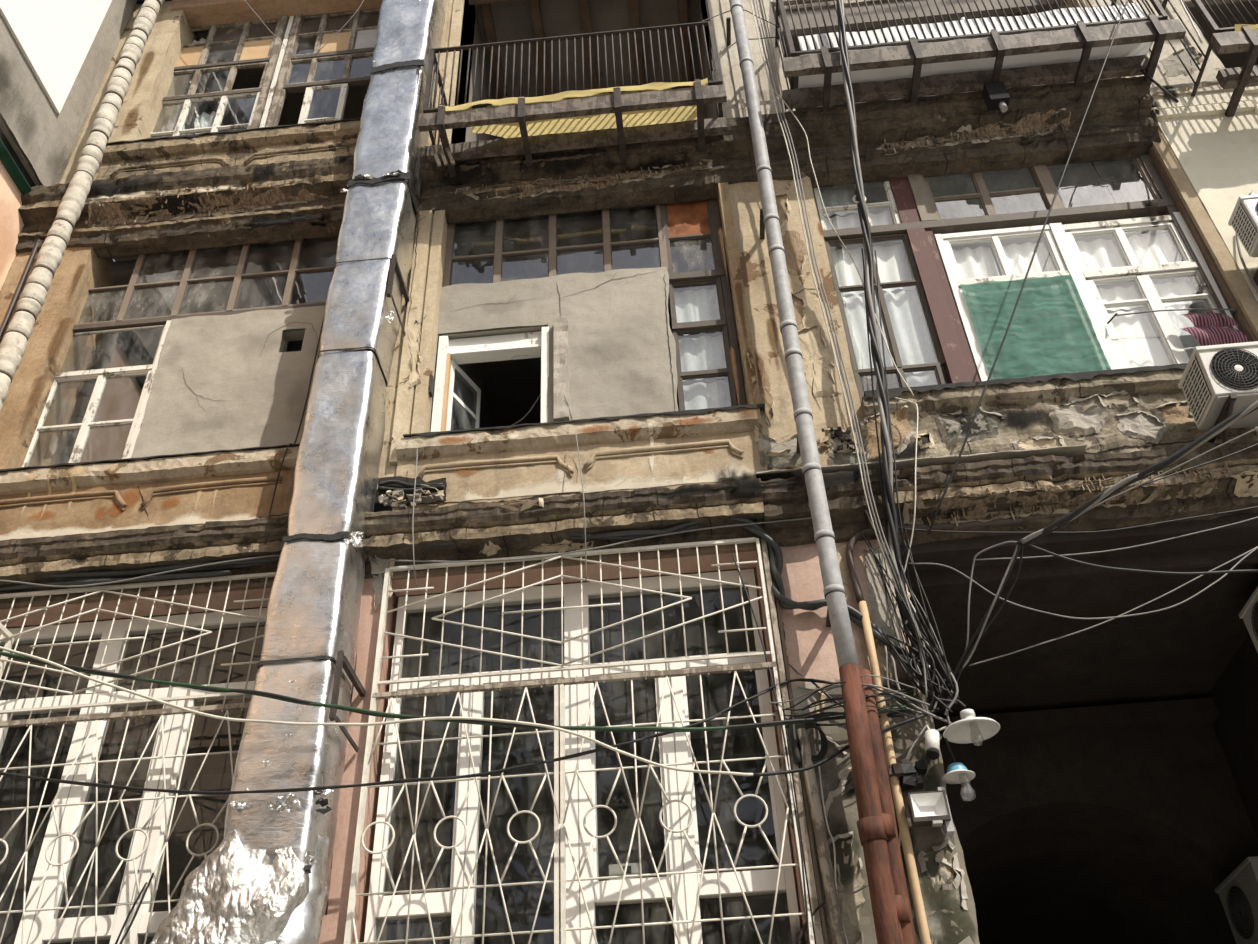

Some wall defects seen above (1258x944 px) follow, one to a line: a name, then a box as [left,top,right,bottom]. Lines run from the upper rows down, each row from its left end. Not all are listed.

spalling [876,107,1071,155]
spalling [85,180,329,228]
spalling [447,159,713,200]
spalling [775,192,808,276]
spalling [791,292,835,397]
spalling [747,344,803,469]
spalling [821,405,1005,466]
spalling [1012,390,1196,450]
spalling [378,476,447,510]
spalling [902,462,1258,527]
spalling [369,555,395,612]
spalling [906,840,973,944]